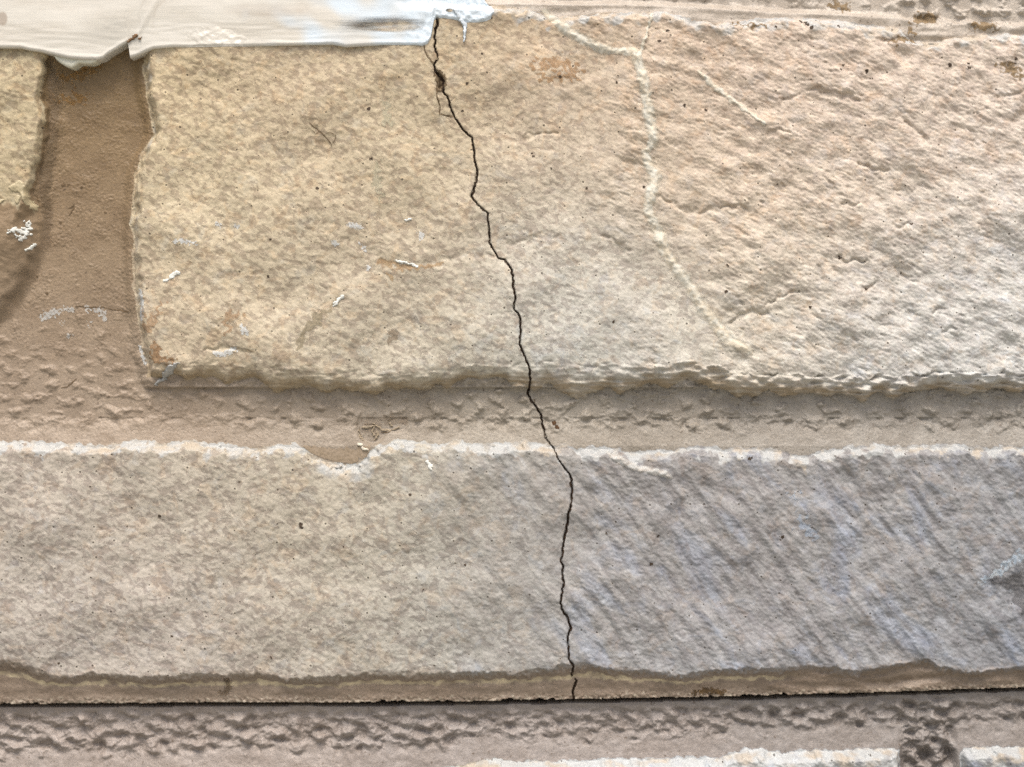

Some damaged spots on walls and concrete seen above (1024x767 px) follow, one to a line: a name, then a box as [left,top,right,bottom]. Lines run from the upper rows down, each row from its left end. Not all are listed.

crack [424,18,578,701]